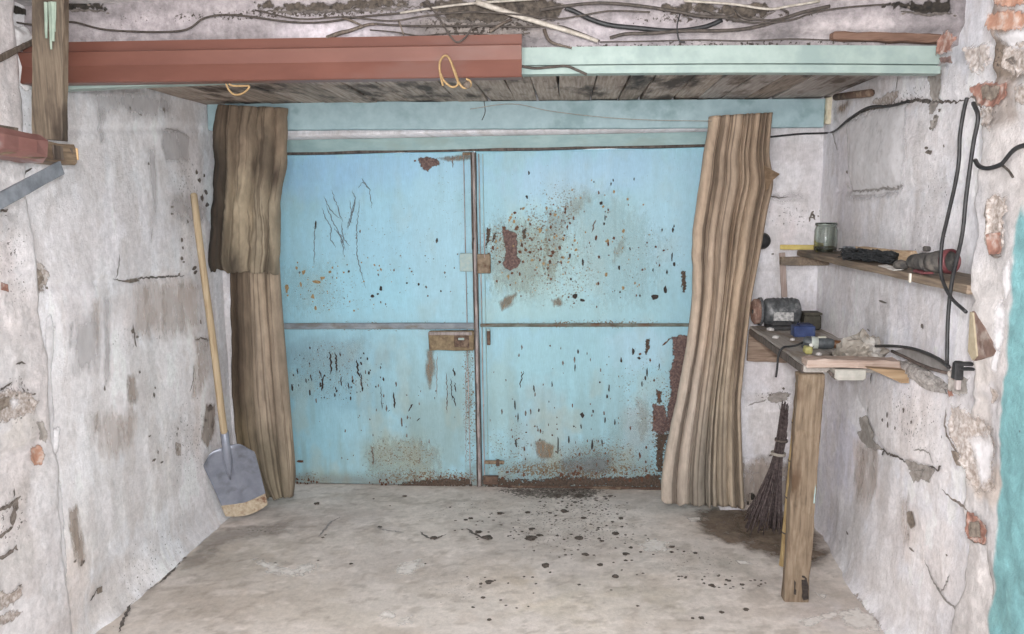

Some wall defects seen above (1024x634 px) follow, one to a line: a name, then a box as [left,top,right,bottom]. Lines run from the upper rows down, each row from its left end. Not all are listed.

flaking render [927,0,1024,131]
crack [832,77,964,149]
rust [414,155,470,172]
crack [115,255,184,283]
rust [485,189,665,309]
flaking render [0,388,48,465]
rust [293,346,388,431]
rust [369,335,687,487]
flaking render [944,370,995,494]
hole [907,511,915,552]
flaking render [942,489,994,598]